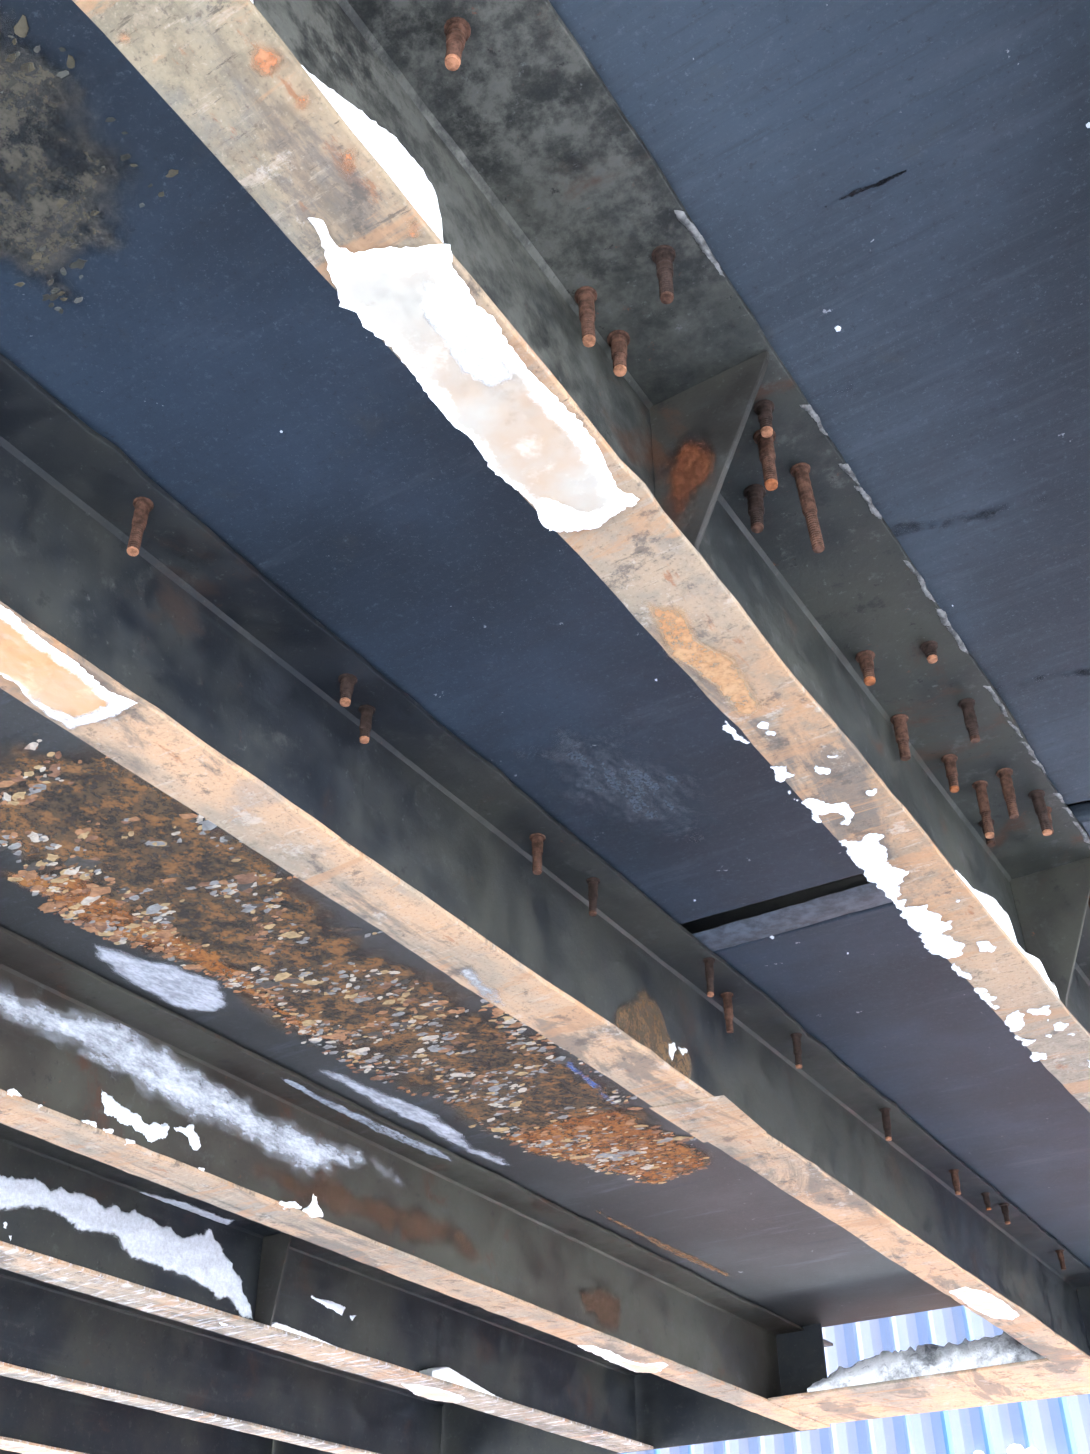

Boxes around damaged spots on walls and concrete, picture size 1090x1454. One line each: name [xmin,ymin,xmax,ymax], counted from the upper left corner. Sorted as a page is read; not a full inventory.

crack [825,170,906,208]
corrosion [0,733,710,1184]